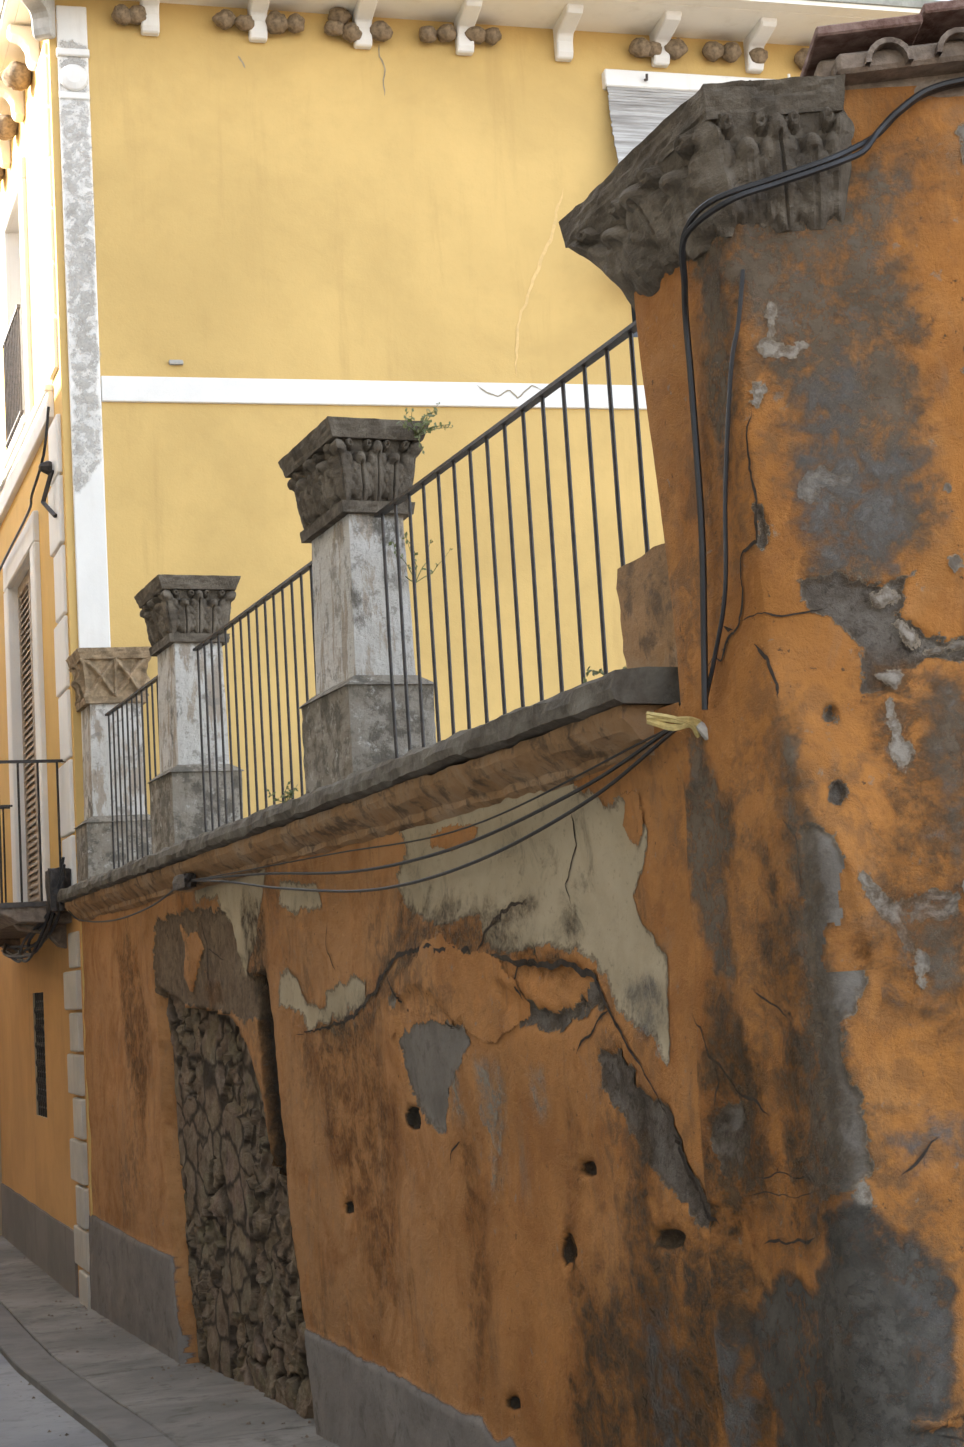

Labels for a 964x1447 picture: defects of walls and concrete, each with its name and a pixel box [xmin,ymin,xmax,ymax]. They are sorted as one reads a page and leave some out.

damp [691,156,947,582]
crack [708,410,827,698]
spalling [796,570,964,773]
spalling [152,869,366,1033]
spalling [399,1019,470,1134]
crack [296,899,720,1225]
peeling [396,784,671,1066]
crack [565,815,577,903]
spalling [598,1048,711,1230]
damp [569,718,959,1447]
crack [753,991,787,1017]
crack [765,1237,815,1245]